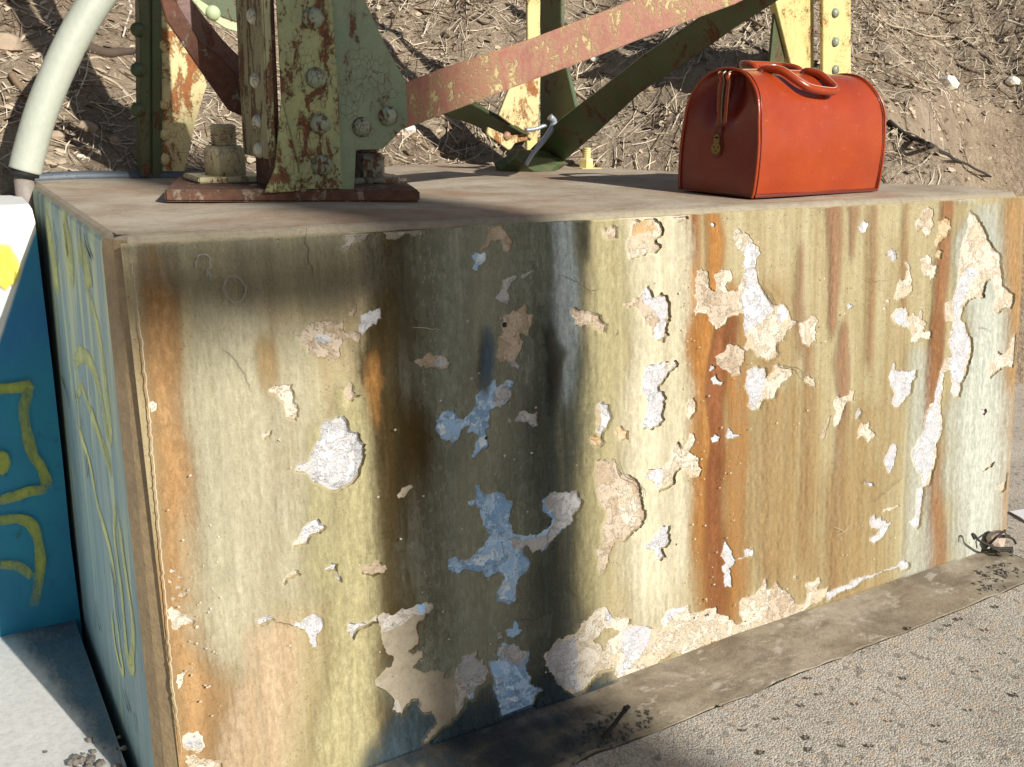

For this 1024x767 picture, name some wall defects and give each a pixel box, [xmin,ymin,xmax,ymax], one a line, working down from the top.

corrosion [140,242,297,767]
peeling [296,415,364,490]
corrosion [364,358,381,421]
water stain [139,215,690,767]
peeling [455,620,542,715]
peeling [447,484,581,605]
corrosion [682,213,749,620]
peeling [543,559,909,694]
peeling [693,229,818,410]
corrosion [927,444,947,569]
corrosion [923,200,955,426]
peeling [908,211,1015,528]